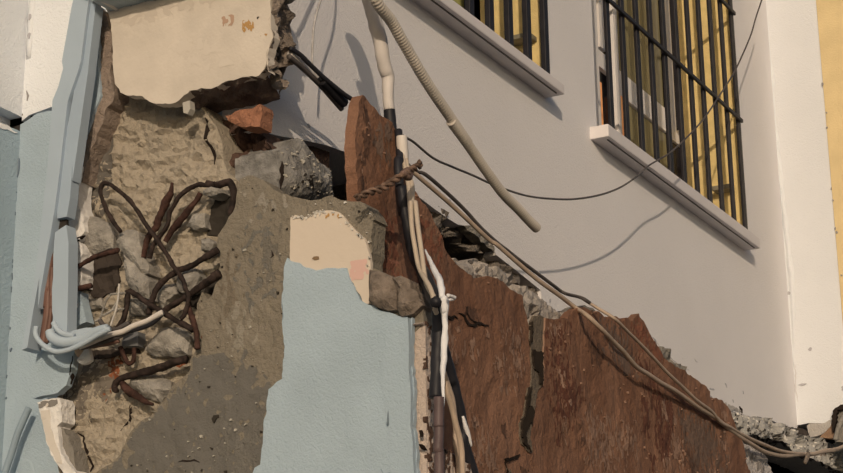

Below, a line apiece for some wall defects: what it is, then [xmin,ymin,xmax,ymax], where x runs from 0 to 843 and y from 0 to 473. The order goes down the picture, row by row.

spalling [37,10,388,473]
crack [448,307,487,327]
crack [504,315,546,473]
spalling [759,410,843,471]